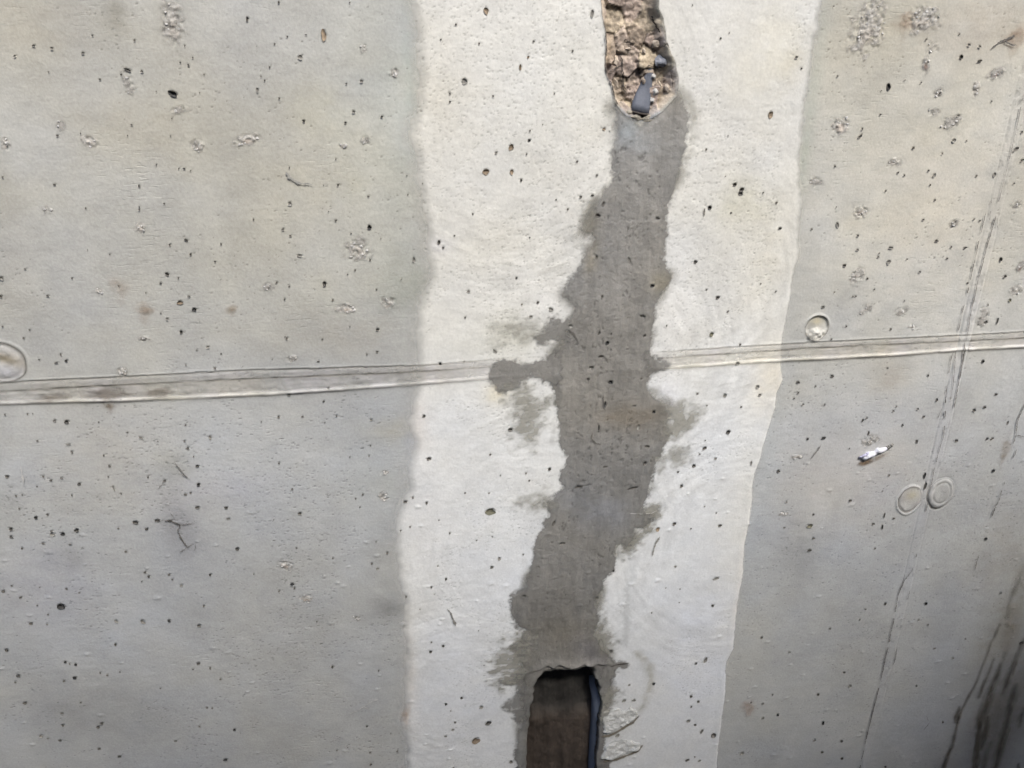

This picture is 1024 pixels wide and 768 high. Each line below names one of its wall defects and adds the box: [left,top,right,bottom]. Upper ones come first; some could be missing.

spalling [601,0,678,122]
leakage [488,91,699,768]
crack [925,94,1024,512]
crack [860,554,917,767]